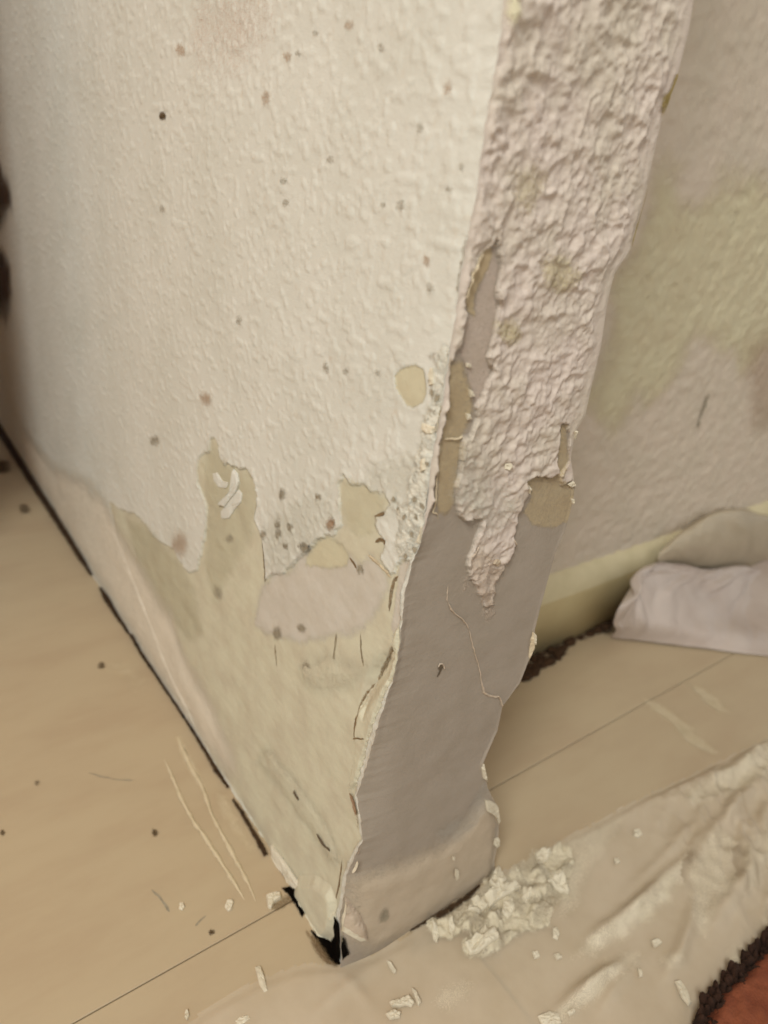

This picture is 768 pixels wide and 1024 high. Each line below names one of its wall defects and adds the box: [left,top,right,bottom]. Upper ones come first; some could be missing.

peeling [109,236,578,974]
crack [446,588,503,708]